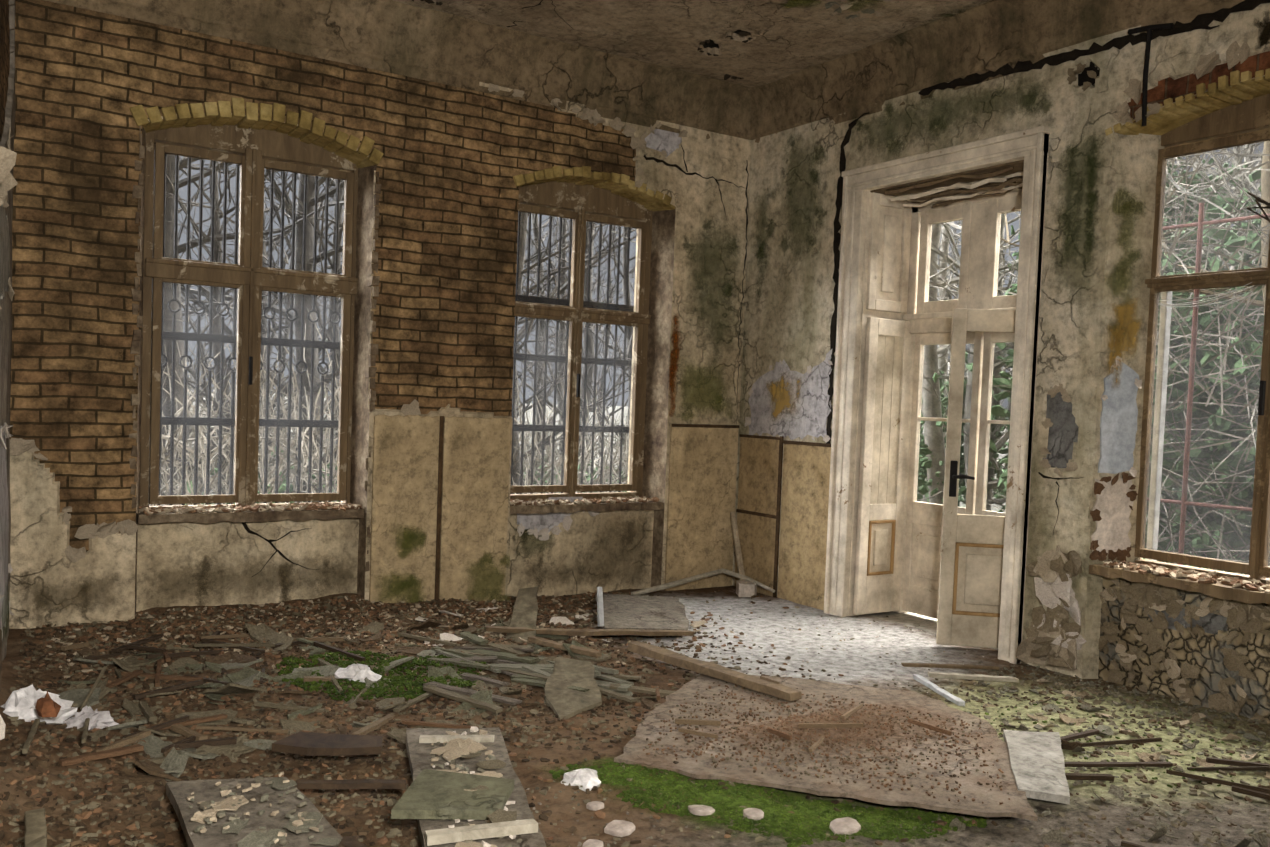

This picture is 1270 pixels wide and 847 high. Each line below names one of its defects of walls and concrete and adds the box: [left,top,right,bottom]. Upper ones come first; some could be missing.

crack [918,0,1270,96]
spalling [1112,41,1270,124]
spalling [0,0,688,638]
damp [682,366,730,420]
peeling [1016,356,1270,721]